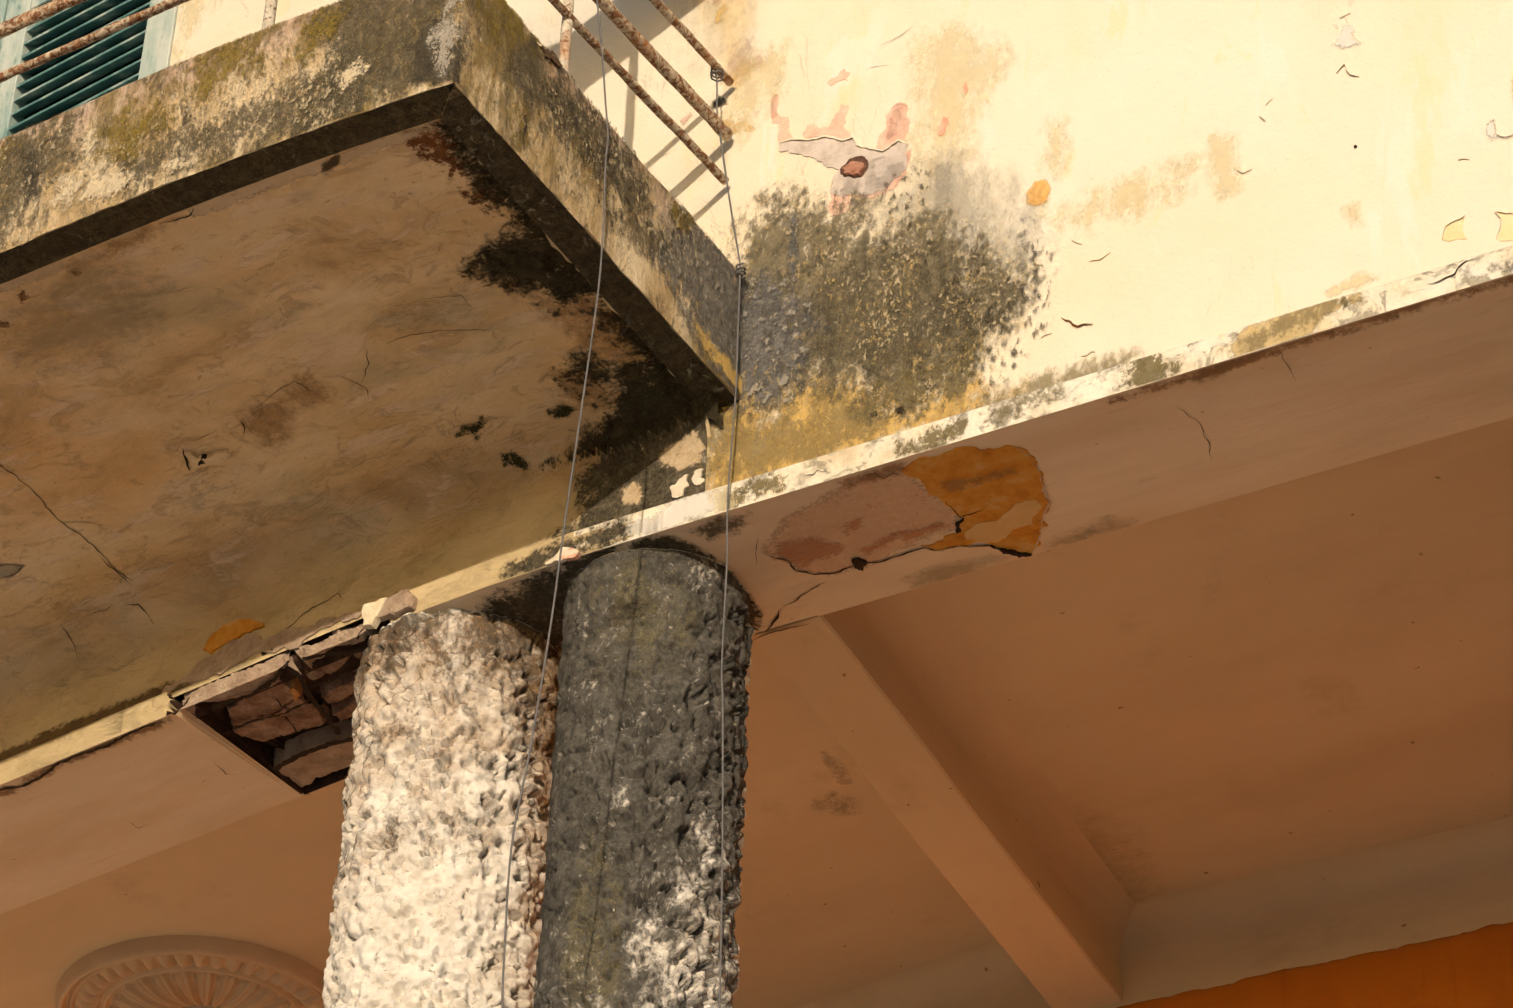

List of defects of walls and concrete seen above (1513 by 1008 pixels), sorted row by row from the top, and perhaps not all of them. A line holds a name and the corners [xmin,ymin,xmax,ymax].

corrosion [712,97,751,133]
spalling [827,68,850,86]
spalling [770,92,912,217]
peeling [1442,215,1467,242]
peeling [1495,210,1513,241]
crack [0,465,153,657]
leakage [0,0,1182,1008]
peeling [762,445,1050,576]
spalling [161,589,418,787]
crack [0,717,171,796]